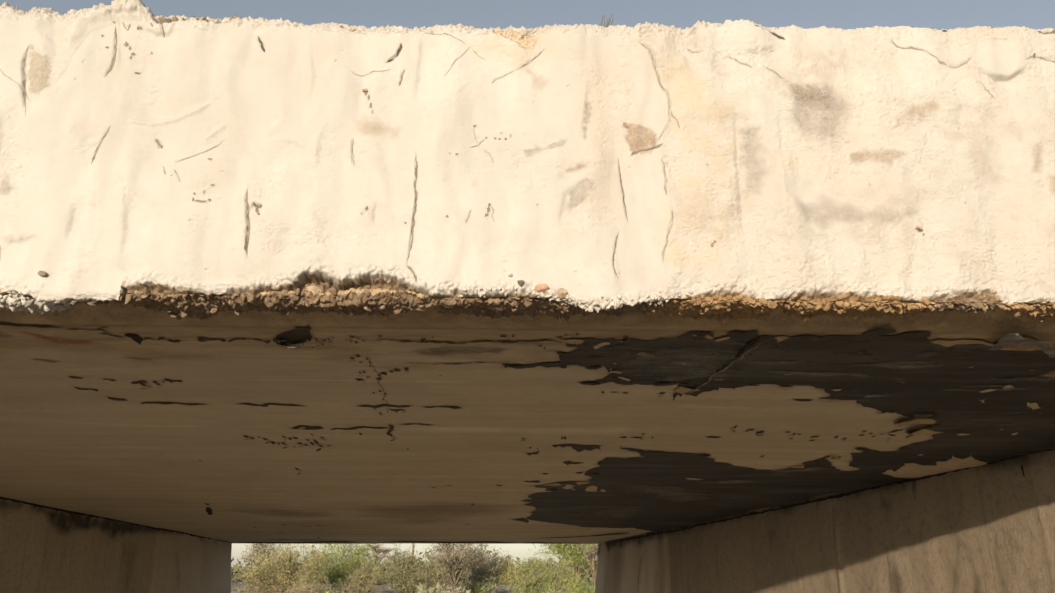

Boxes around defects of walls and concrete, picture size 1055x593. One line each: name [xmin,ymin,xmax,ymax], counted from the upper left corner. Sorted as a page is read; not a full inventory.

crack [244,192,262,254]
crack [407,157,418,283]
crack [69,377,207,405]
crack [236,339,565,436]
peeling [70,274,1055,532]
crack [686,338,761,396]